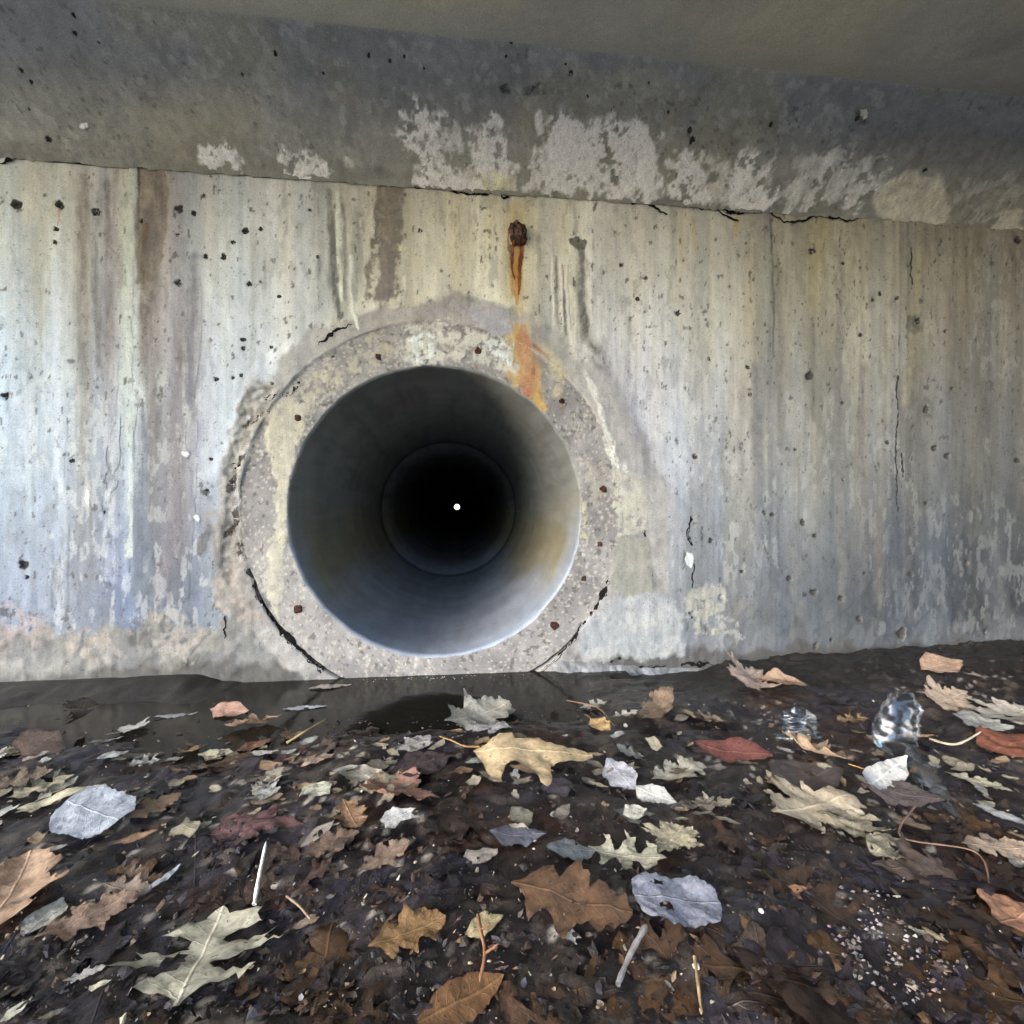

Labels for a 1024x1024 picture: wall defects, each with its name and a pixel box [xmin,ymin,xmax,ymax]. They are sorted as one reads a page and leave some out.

crack [450,190,510,199]
crack [627,203,668,215]
crack [699,208,859,224]
crack [247,381,300,427]
crack [318,324,352,346]
damp [0,90,1024,648]
rust [479,194,573,414]
crack [232,459,324,673]
crack [542,580,610,671]
damp [665,575,706,663]